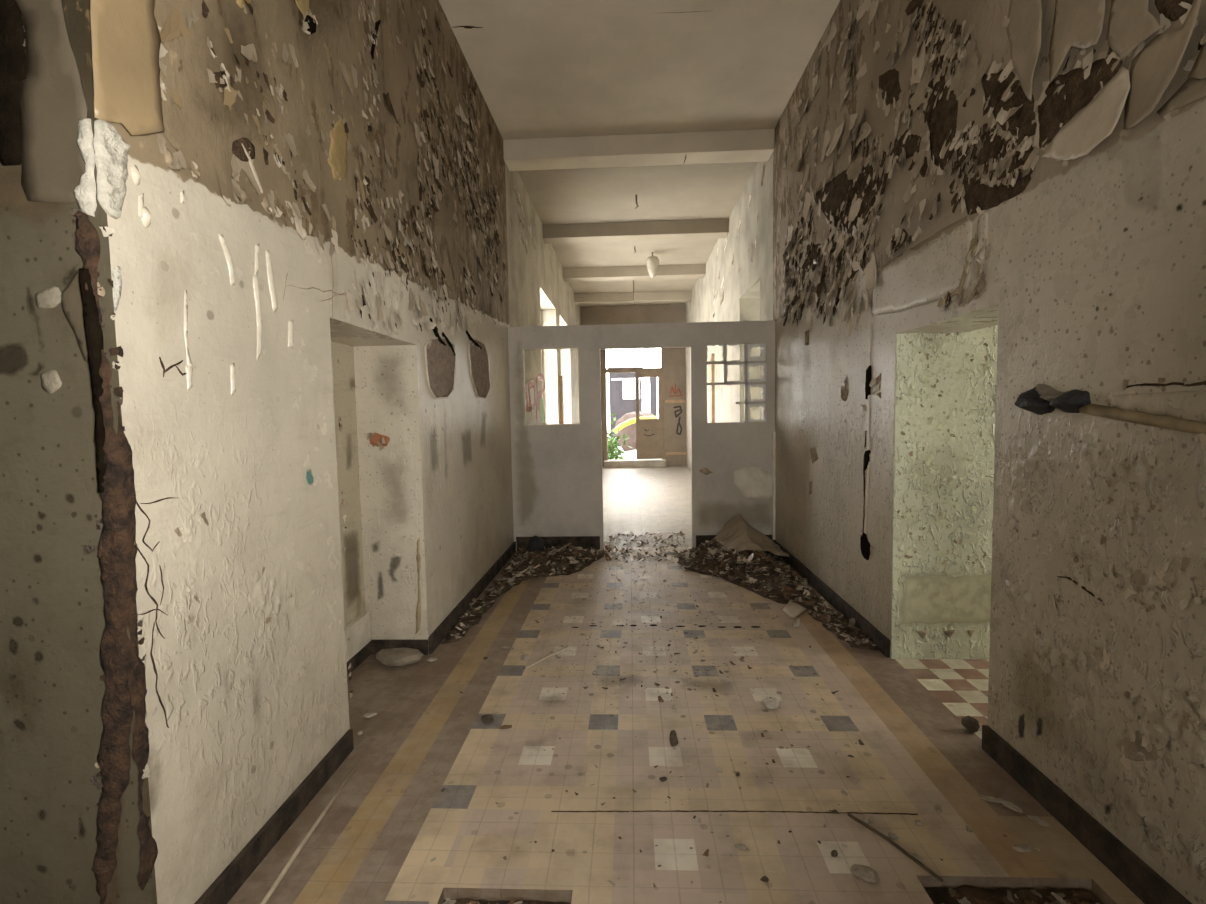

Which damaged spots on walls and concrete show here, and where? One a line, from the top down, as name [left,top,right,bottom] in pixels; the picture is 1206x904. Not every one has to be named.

spalling [207,0,537,399]
peeling [713,161,765,317]
peeling [782,0,1206,345]
spalling [15,0,209,904]
spalling [365,432,390,451]
spalling [838,373,883,413]
crack [860,323,874,561]
crack [1123,375,1206,390]
crack [136,497,175,728]